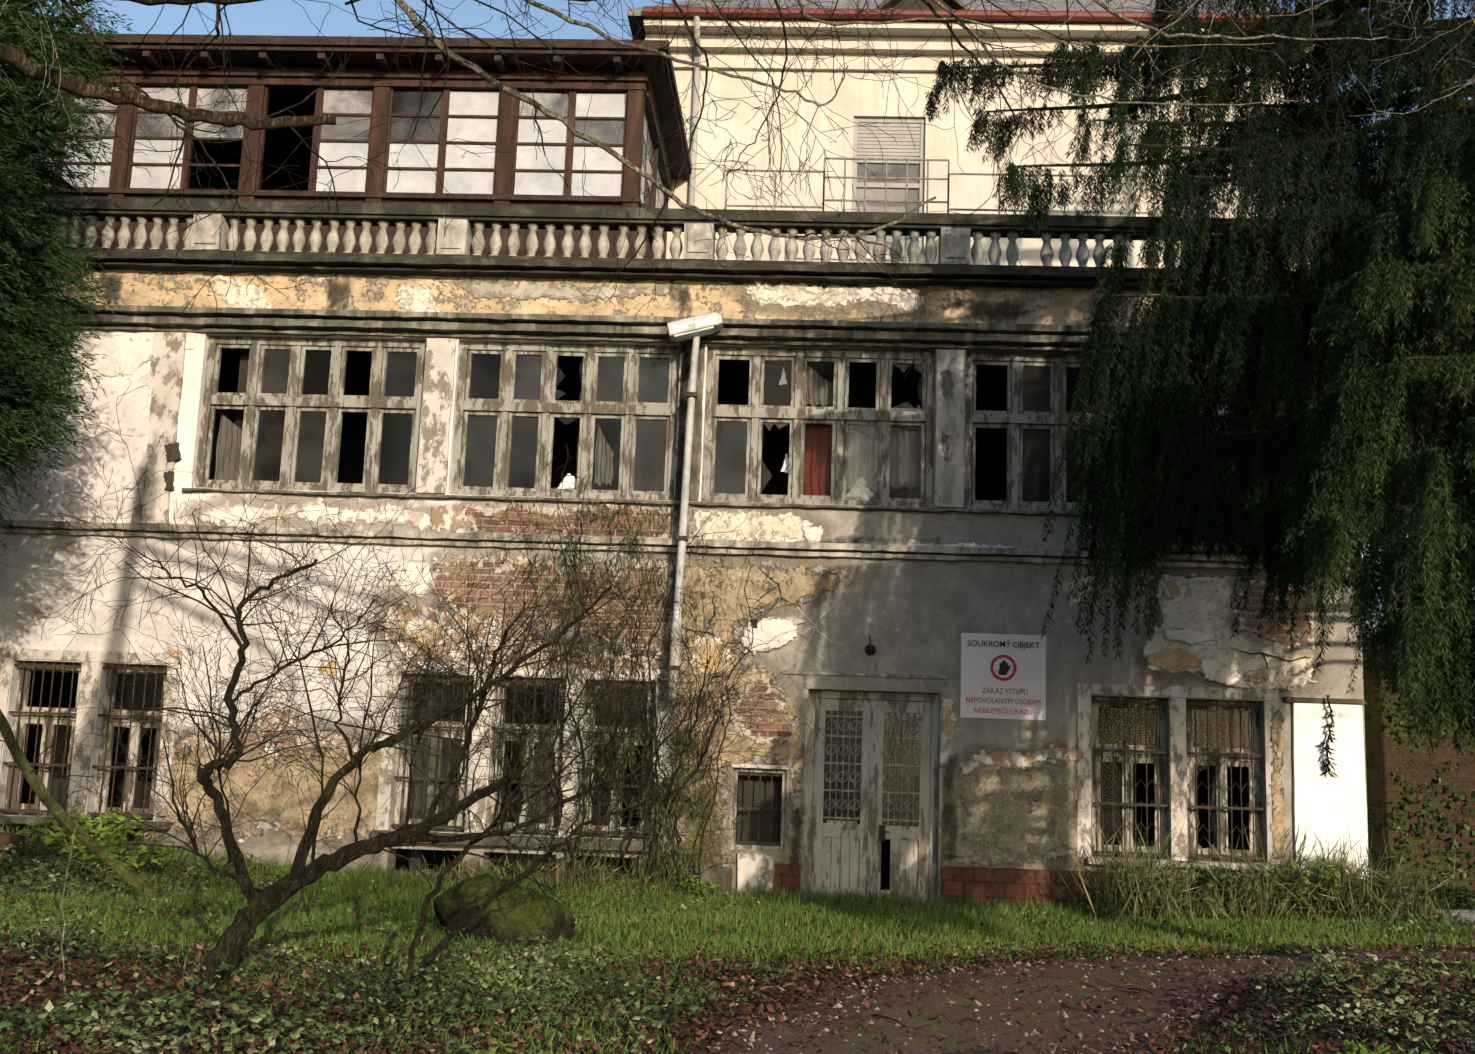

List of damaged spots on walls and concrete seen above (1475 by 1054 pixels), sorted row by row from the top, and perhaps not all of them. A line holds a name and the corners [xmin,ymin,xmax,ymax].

peeling [393,282,443,312]
peeling [745,281,924,311]
peeling [941,431,950,460]
peeling [940,369,954,398]
spalling [199,497,850,867]
spalling [1143,564,1317,691]
spalling [943,743,1083,867]
spalling [1270,710,1287,859]